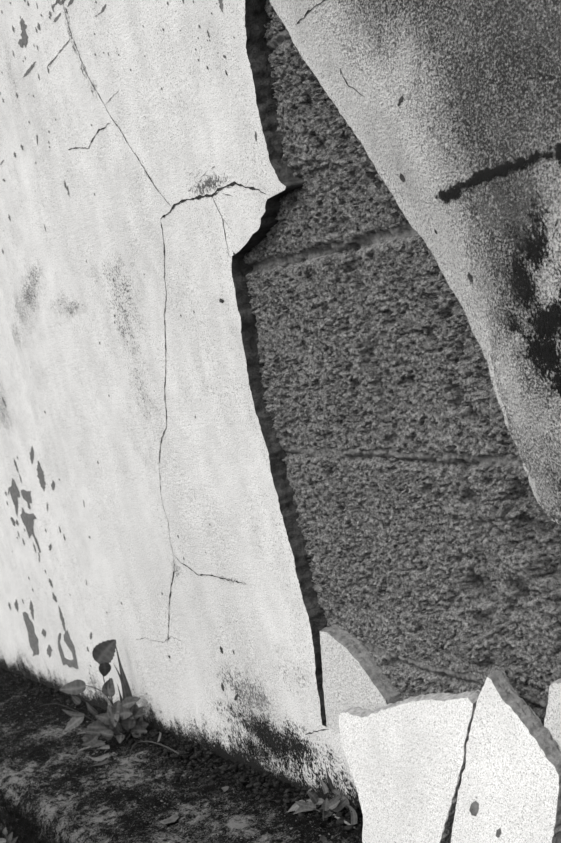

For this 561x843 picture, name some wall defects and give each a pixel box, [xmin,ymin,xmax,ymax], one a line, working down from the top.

crack [50,1,265,644]
peeling [211,0,225,17]
flaking render [231,0,561,726]